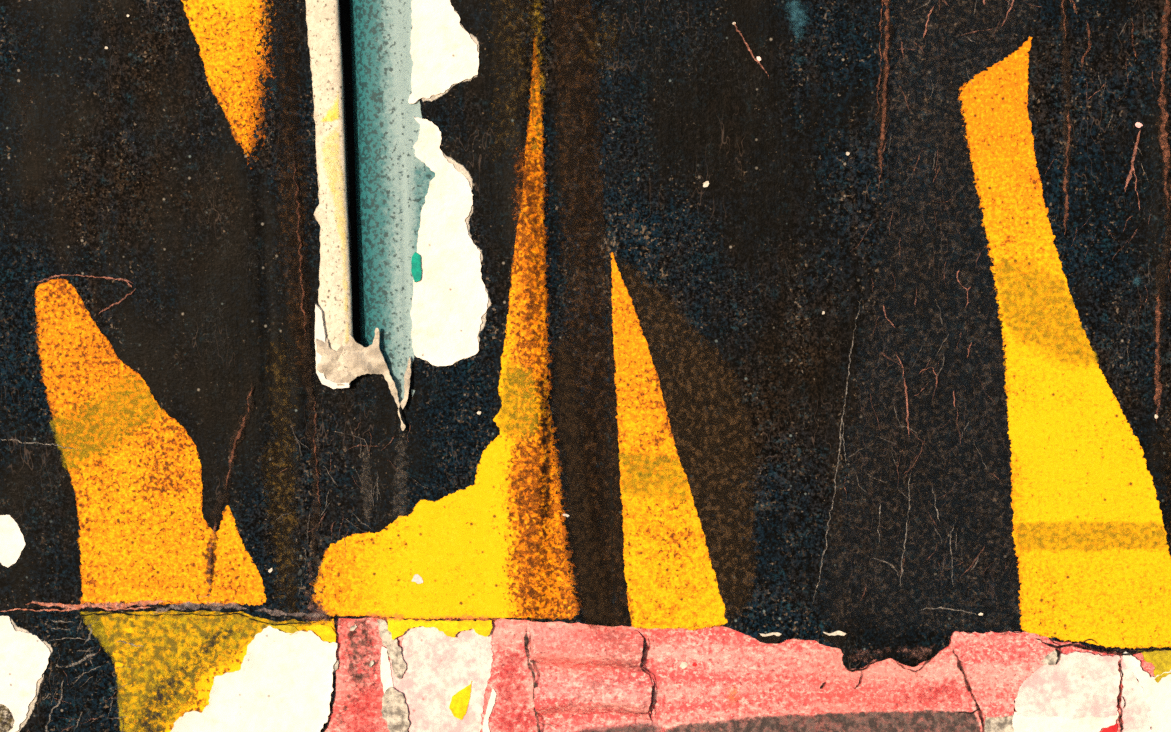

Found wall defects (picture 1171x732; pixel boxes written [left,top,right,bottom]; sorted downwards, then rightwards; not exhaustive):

peeling [411,252,422,282]